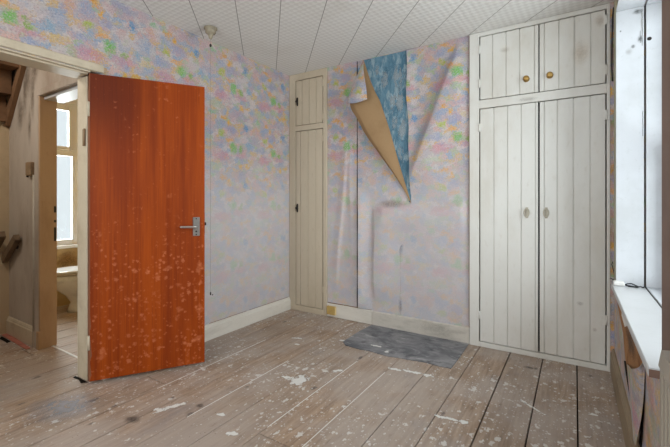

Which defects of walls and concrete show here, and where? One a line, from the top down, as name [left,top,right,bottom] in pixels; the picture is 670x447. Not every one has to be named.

flaking render [364,51,411,202]
flaking render [618,305,642,369]